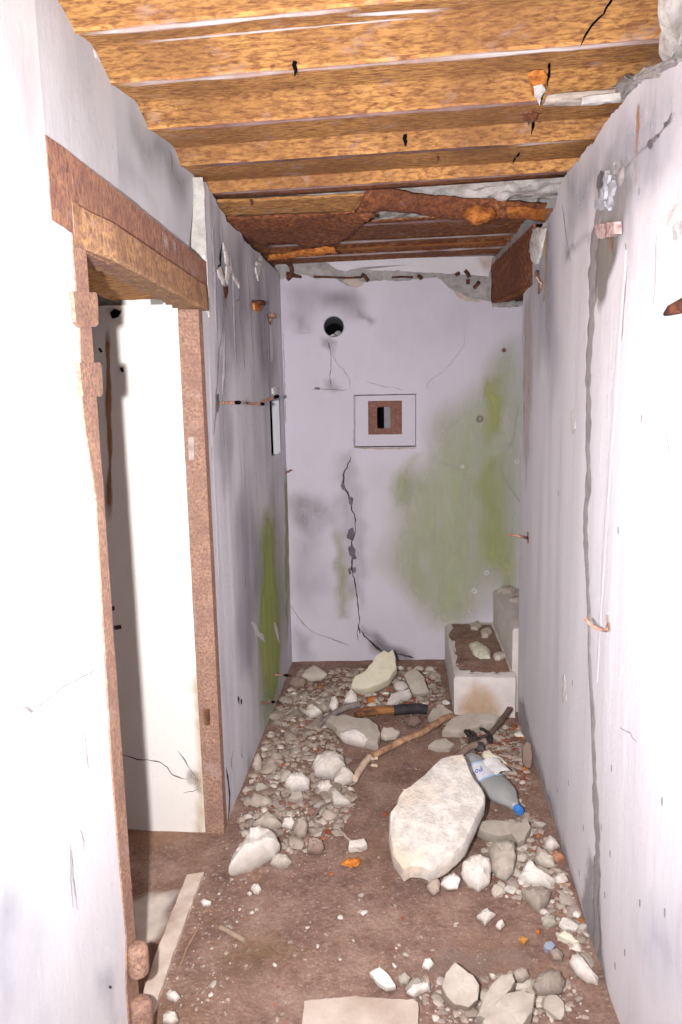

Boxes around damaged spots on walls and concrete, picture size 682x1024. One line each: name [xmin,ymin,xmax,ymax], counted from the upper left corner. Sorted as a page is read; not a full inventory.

crack [580,0,613,47]
spalling [396,177,564,202]
flaking render [594,161,624,211]
rust [267,246,338,261]
rust [506,206,553,297]
spalling [189,177,495,394]
crack [291,457,413,659]
crack [122,751,197,793]